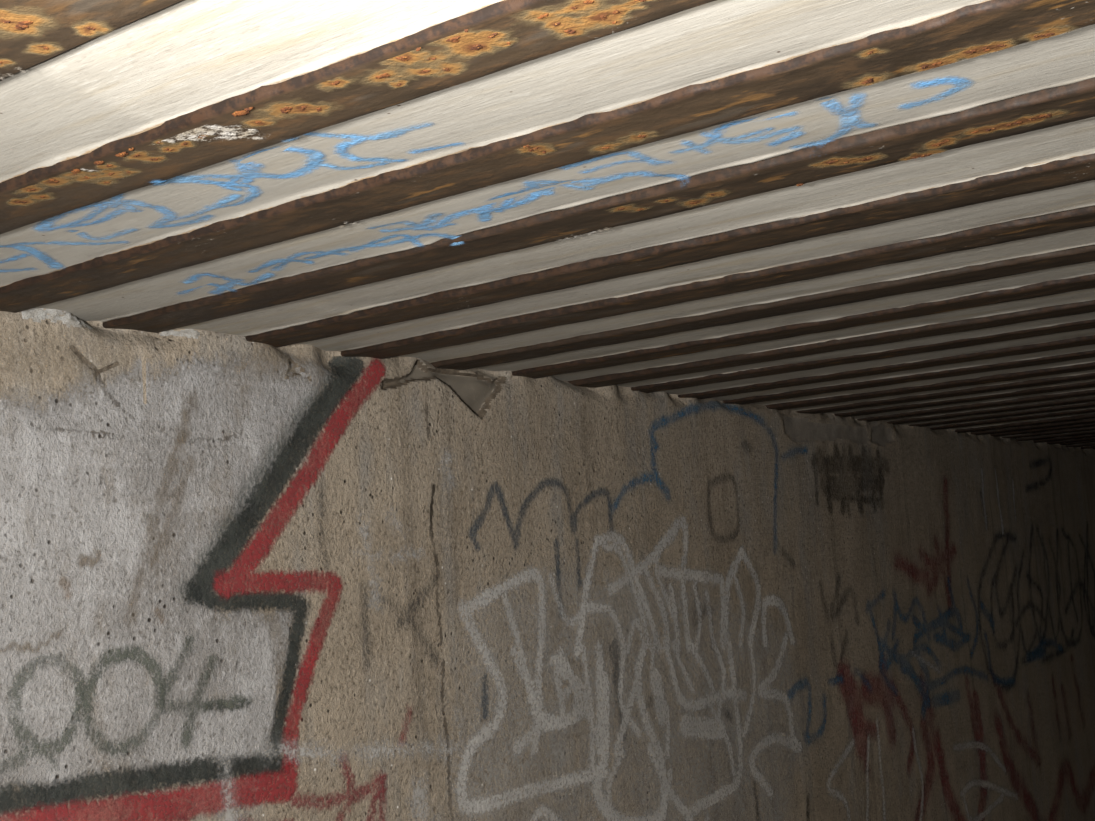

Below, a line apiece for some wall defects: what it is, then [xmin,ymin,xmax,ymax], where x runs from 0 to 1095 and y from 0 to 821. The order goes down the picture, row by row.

corrosion [0,9,61,55]
corrosion [74,22,110,36]
corrosion [319,77,351,89]
corrosion [366,29,516,88]
corrosion [523,0,653,37]
corrosion [850,75,887,87]
corrosion [906,26,1071,72]
efflorescence [162,125,263,143]
corrosion [232,102,331,127]
corrosion [7,134,210,206]
spalling [381,359,506,420]
crack [428,484,436,530]